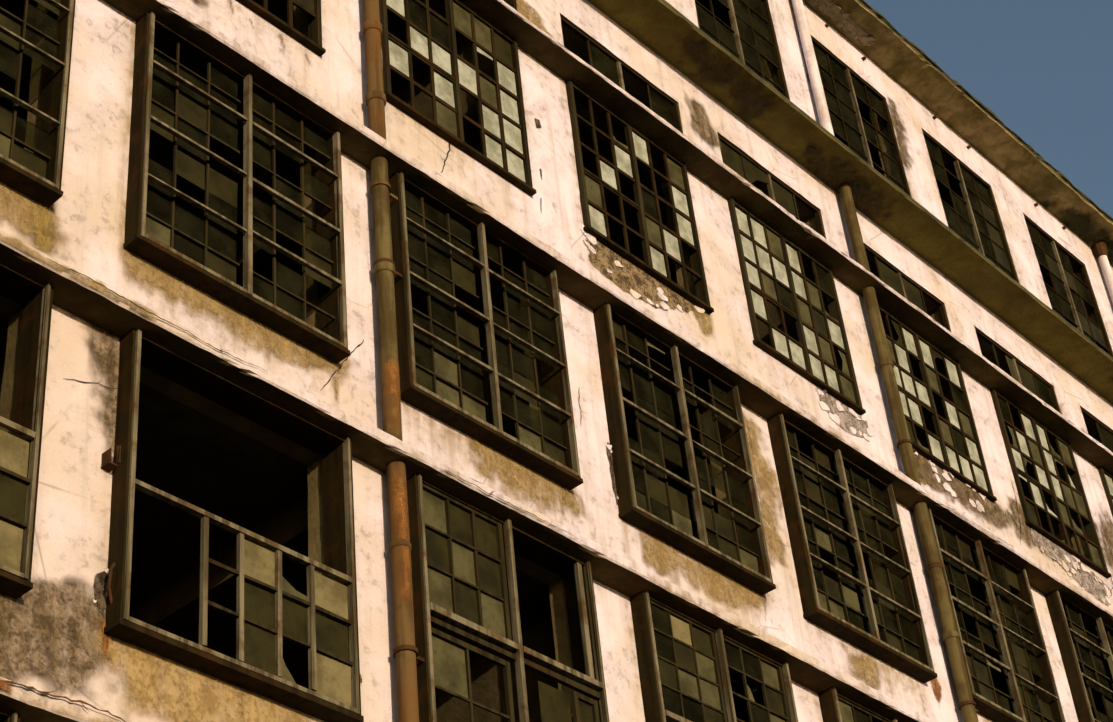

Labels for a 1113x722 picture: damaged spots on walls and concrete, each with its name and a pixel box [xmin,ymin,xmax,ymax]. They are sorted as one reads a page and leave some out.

water stain [888,98,911,168]
water stain [805,145,891,218]
spalling [580,224,705,314]
crack [321,339,364,390]
corrosion [386,363,400,425]
spalling [817,386,875,441]
water stain [743,414,785,565]
peeling [914,452,986,512]
corrosion [392,480,410,595]
peeling [1031,528,1112,606]
water stain [97,631,307,722]